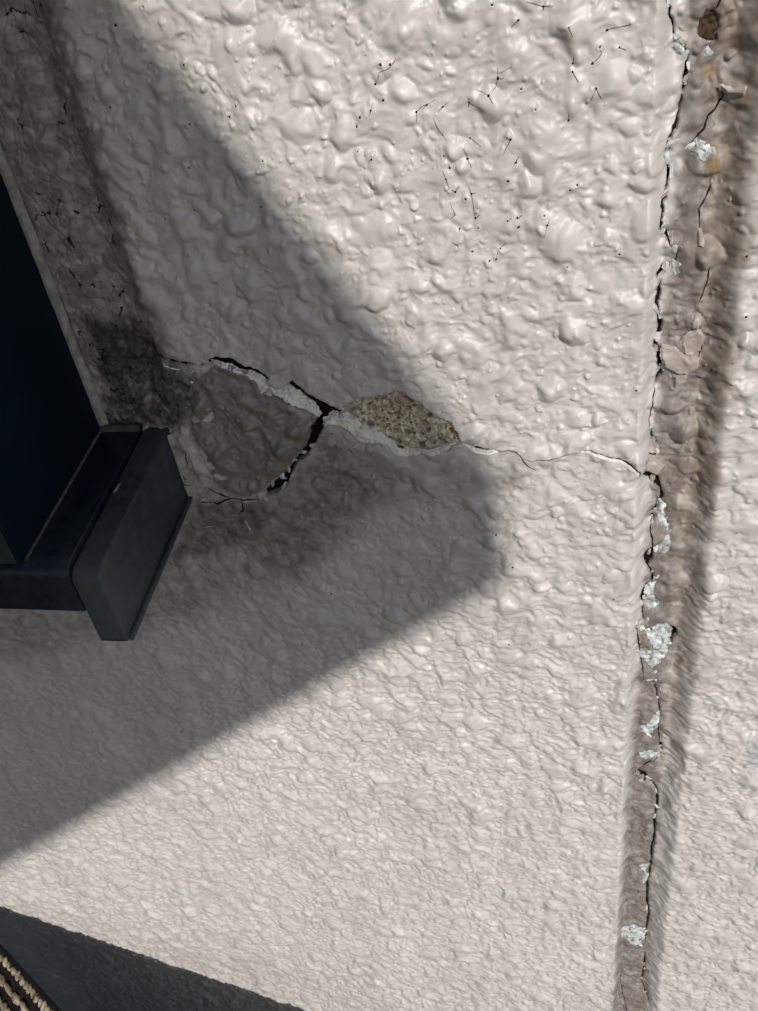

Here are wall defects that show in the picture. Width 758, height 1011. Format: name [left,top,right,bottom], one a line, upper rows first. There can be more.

crack [6,1,43,33]
damp [726,0,758,53]
crack [416,67,519,219]
crack [34,192,149,333]
damp [689,68,758,394]
crack [110,356,380,514]
spalling [338,390,460,457]
crack [457,0,724,1011]
peeling [642,581,659,609]
peeling [636,623,673,682]
peeling [650,498,672,556]
damp [679,406,722,560]